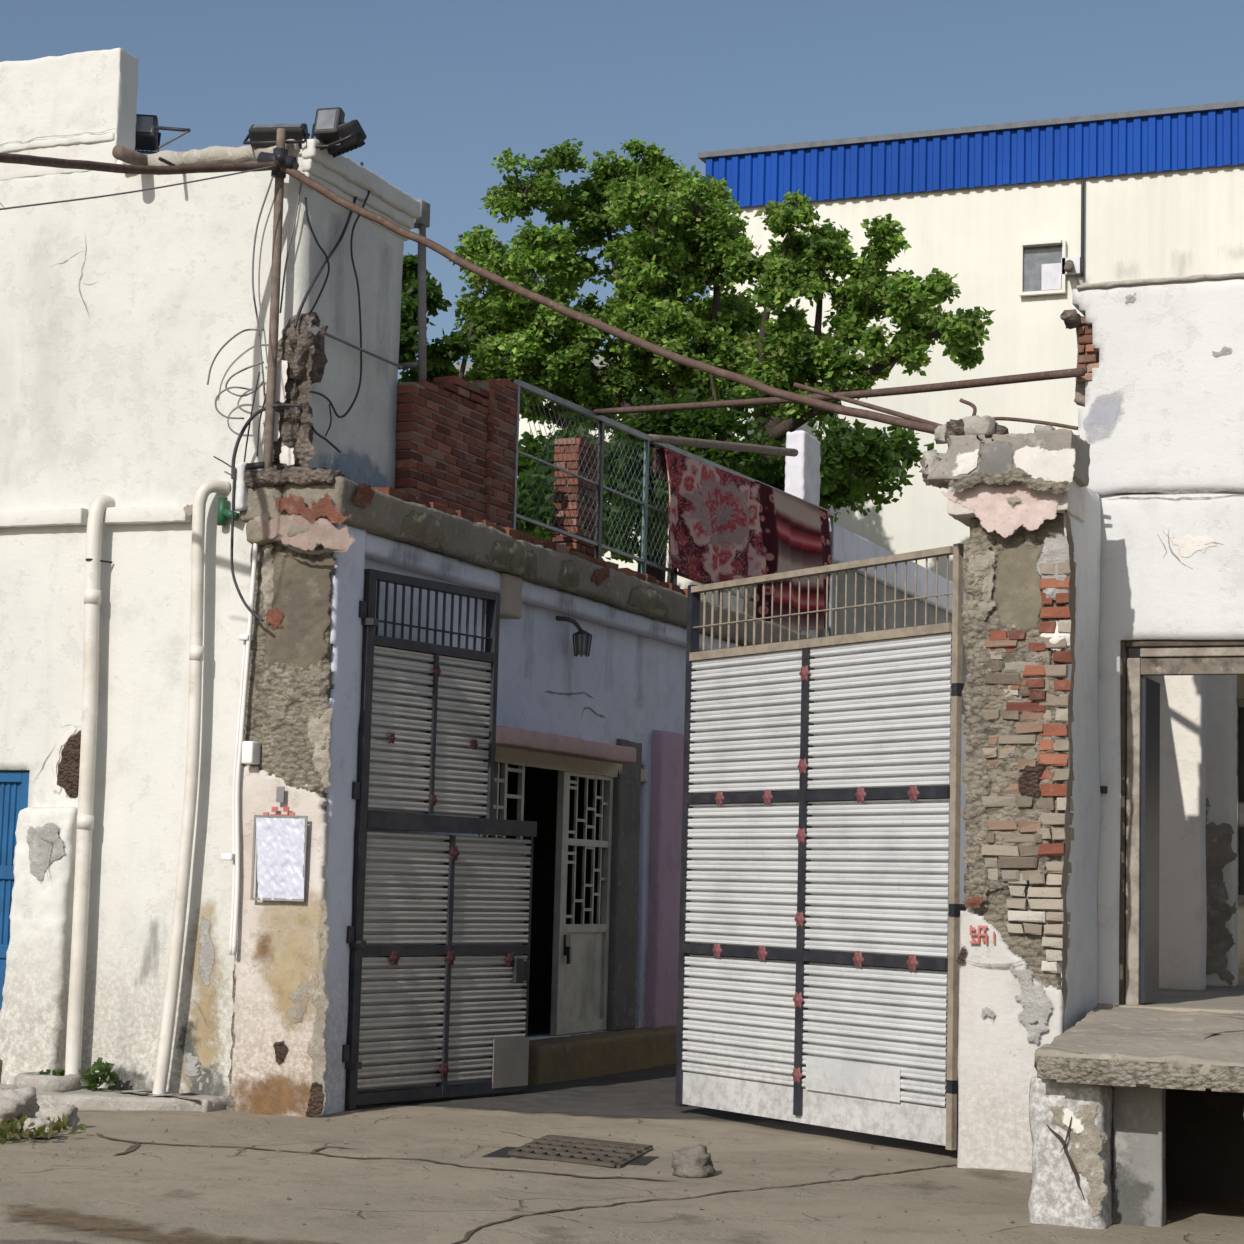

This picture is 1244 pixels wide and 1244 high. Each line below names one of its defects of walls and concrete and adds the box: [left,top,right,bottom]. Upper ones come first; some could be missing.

flaking render [234,312,688,792]
flaking render [32,724,81,798]
flaking render [919,441,1244,1093]
damp [179,908,228,1100]
damp [255,899,322,1026]
crack [1204,1014,1244,1035]
crack [96,1133,957,1244]